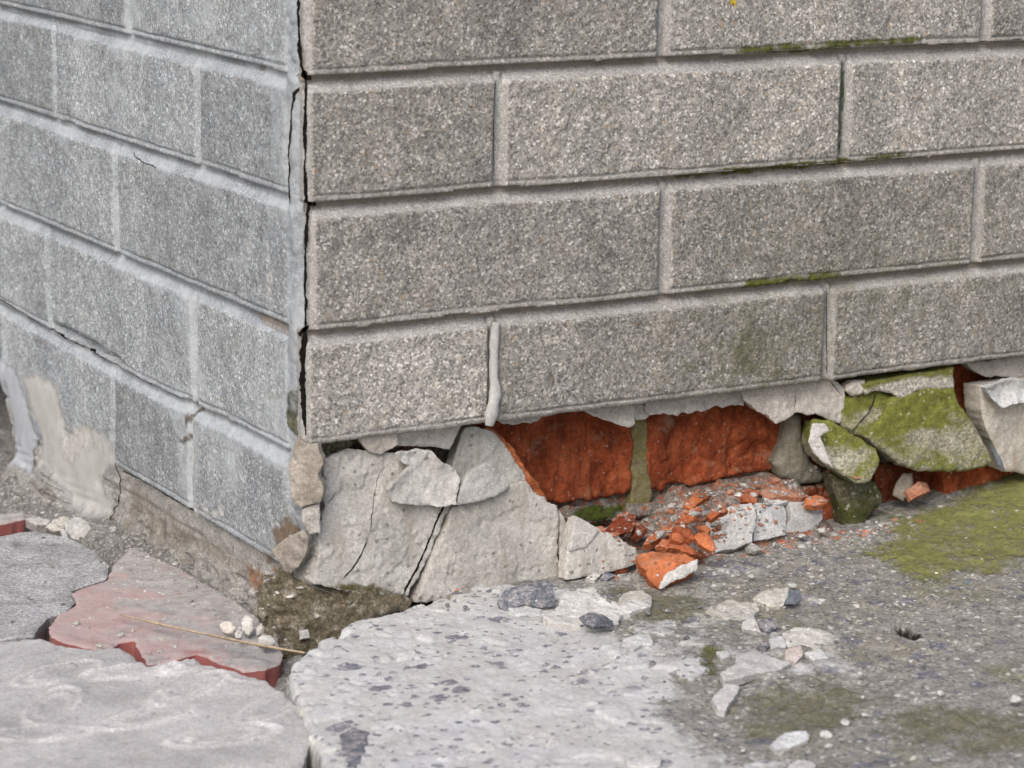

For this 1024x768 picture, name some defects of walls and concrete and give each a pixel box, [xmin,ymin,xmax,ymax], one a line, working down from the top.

crack [288,0,317,435]
spalling [951,364,993,413]
peeling [386,448,460,507]
spalling [470,380,845,551]
spalling [871,462,1015,503]
crack [343,473,380,579]
crack [404,507,444,593]